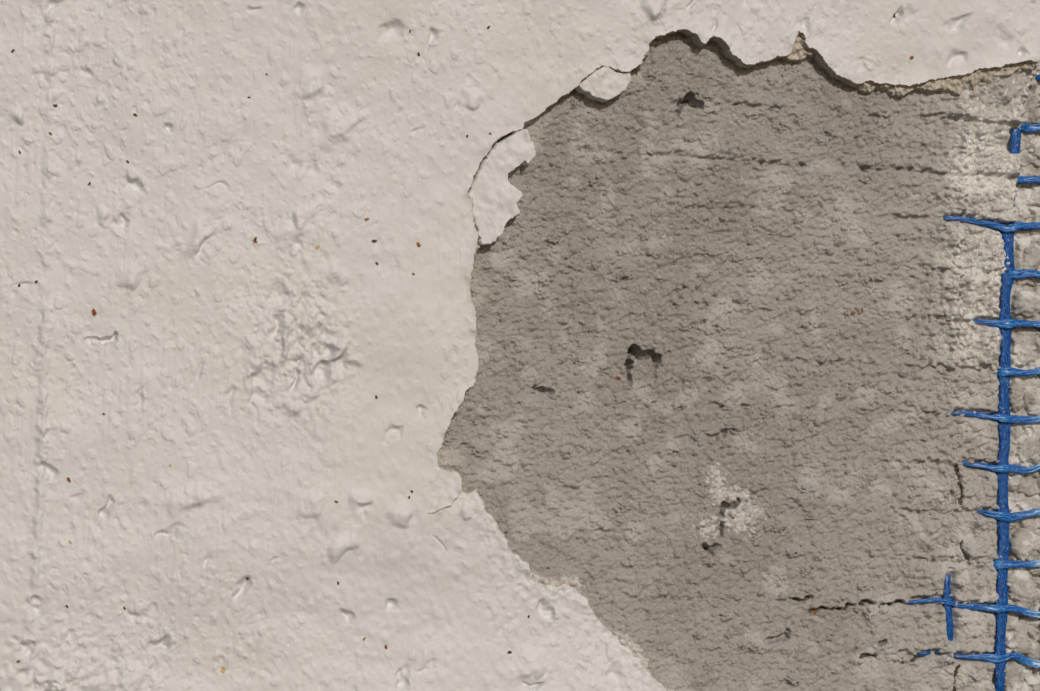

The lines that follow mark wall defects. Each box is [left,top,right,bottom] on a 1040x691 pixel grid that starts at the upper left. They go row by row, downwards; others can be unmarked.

peeling [426,26,1040,691]
crack [792,595,903,613]
crack [859,654,917,664]